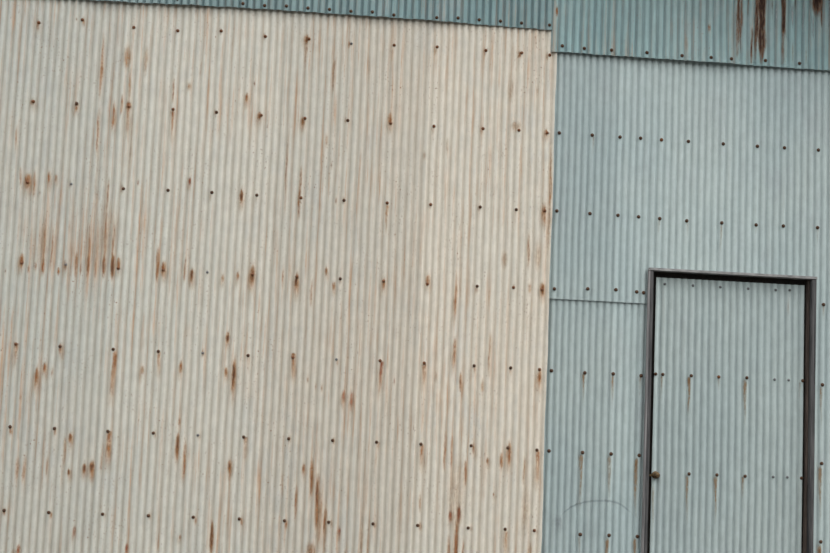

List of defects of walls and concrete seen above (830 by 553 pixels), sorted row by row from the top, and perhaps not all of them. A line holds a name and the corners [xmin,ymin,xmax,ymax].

rust [736,0,796,59]
rust [812,0,823,24]
rust [102,222,120,276]
rust [302,464,326,529]
rust [448,508,464,553]